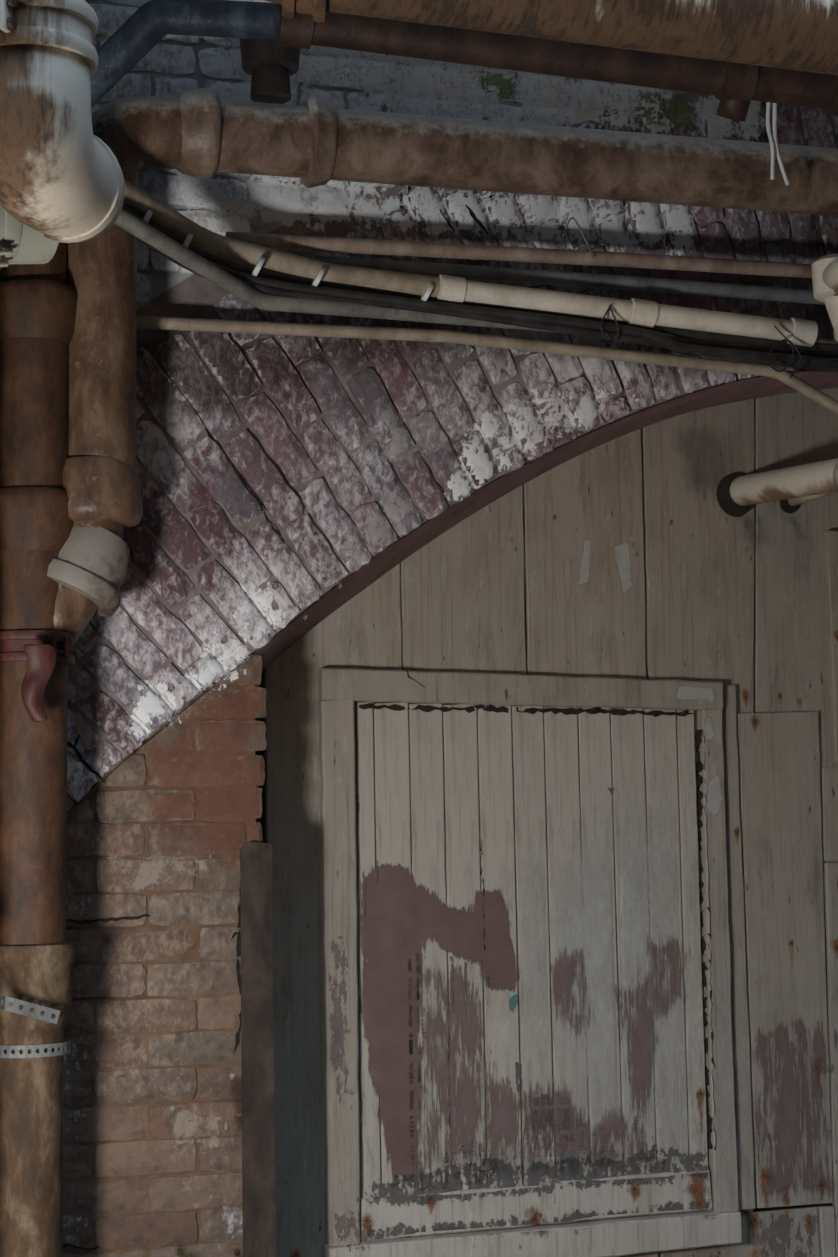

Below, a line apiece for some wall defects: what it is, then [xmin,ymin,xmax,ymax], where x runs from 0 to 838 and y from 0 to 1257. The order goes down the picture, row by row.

peeling [183,444,243,515]
peeling [335,473,416,567]
peeling [439,380,644,509]
peeling [128,561,342,738]
peeling [329,861,717,1252]
peeling [753,1019,837,1257]